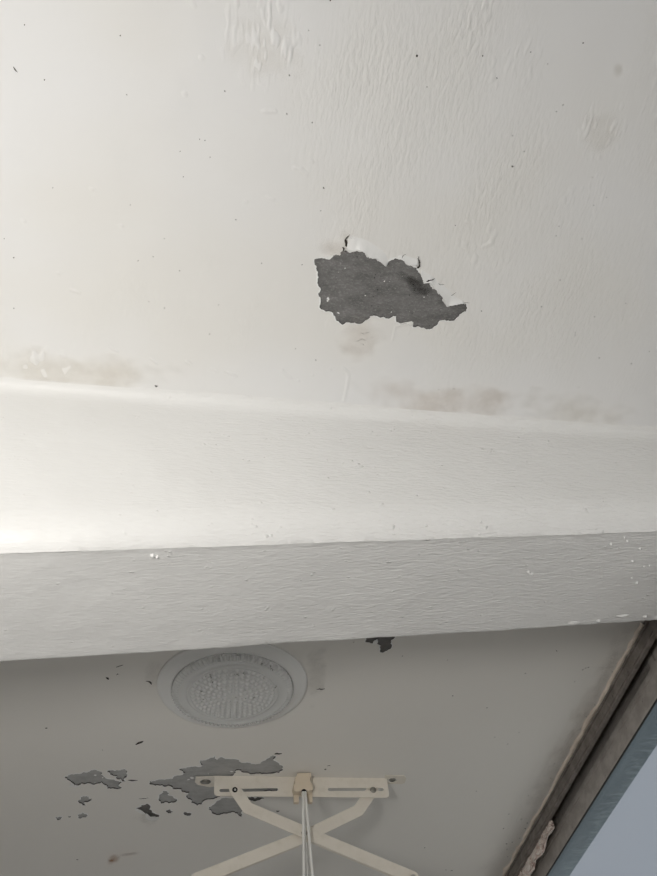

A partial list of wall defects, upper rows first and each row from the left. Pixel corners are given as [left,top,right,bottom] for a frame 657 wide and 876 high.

peeling [313,236,468,330]
peeling [364,637,396,653]
peeling [55,753,284,821]